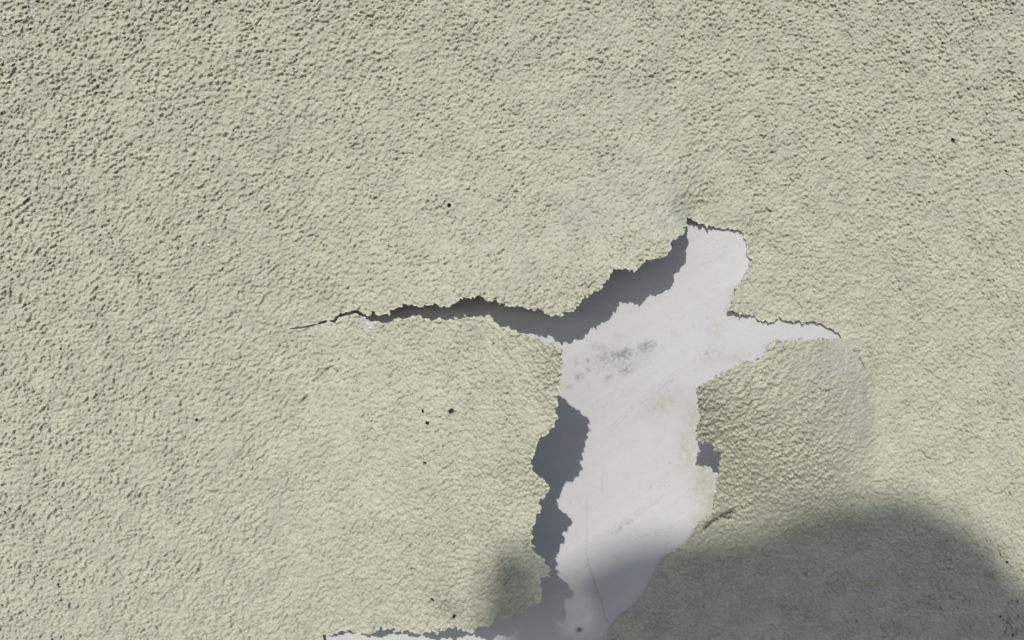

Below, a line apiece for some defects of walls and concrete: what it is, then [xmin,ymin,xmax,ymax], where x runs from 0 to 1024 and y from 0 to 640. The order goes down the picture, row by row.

crack [290,295,553,344]
flaking render [281,51,873,640]